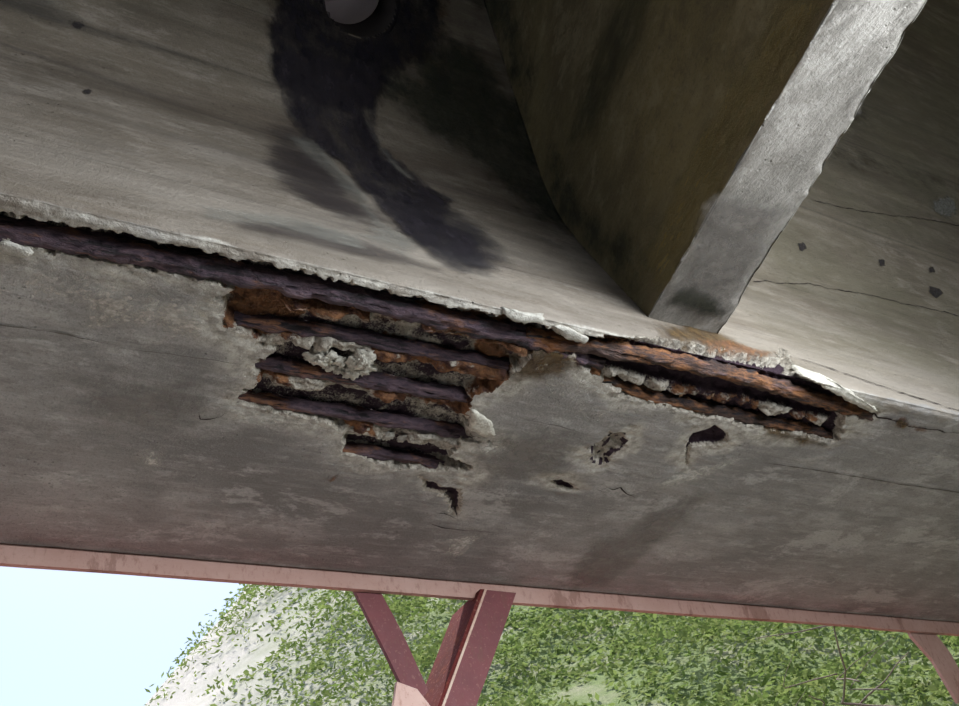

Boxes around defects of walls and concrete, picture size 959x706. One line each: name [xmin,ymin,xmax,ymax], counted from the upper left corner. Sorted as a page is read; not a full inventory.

spalling [0,238,534,516]
damp [240,214,398,257]
rust [342,441,445,469]
rust [0,216,875,446]
spalling [0,211,881,465]
damp [270,0,630,268]
spalling [548,479,579,492]
crack [799,358,957,433]